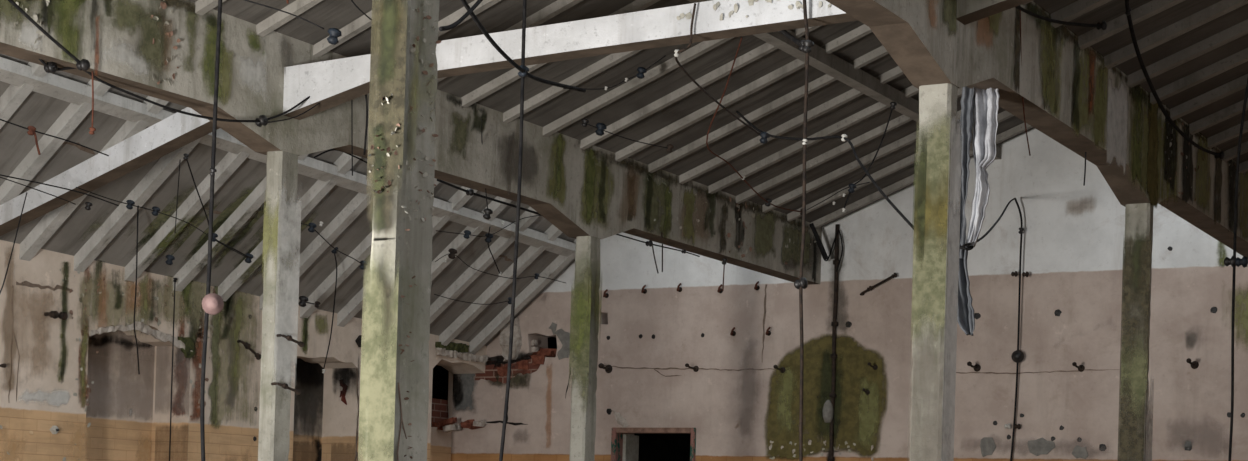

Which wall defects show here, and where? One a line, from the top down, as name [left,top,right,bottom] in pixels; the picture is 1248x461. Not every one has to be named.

water stain [0,0,111,75]
water stain [137,0,216,81]
water stain [1014,3,1100,132]
water stain [447,95,487,158]
water stain [585,149,606,223]
water stain [627,172,745,252]
water stain [912,146,927,253]
water stain [1129,87,1222,224]
water stain [60,260,206,406]
water stain [212,291,257,427]
spalling [475,340,557,384]